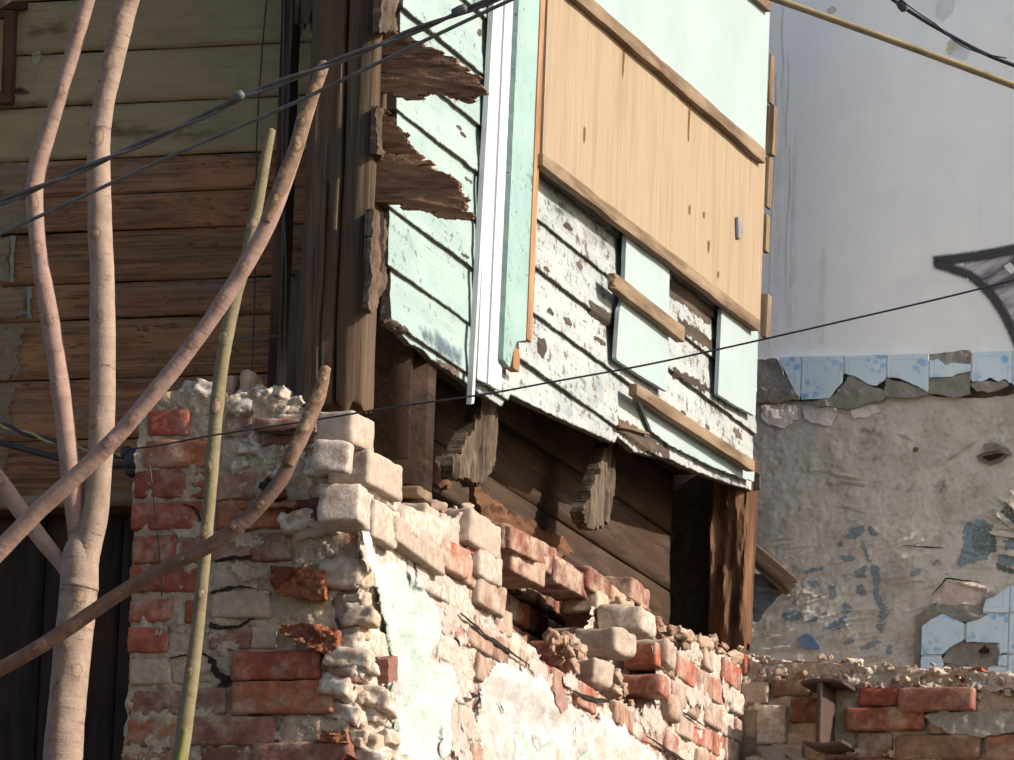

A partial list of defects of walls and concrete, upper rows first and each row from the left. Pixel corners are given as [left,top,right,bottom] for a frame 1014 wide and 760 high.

peeling [588,300,615,330]
peeling [669,275,718,355]
peeling [537,337,547,358]
peeling [671,367,711,393]
flaking render [761,403,839,429]
peeling [971,523,1014,574]
spalling [268,565,329,602]
peeling [781,567,852,631]
peeling [838,527,892,655]
flaking render [932,578,989,606]
flaking render [362,530,459,760]
flaking render [475,660,671,760]